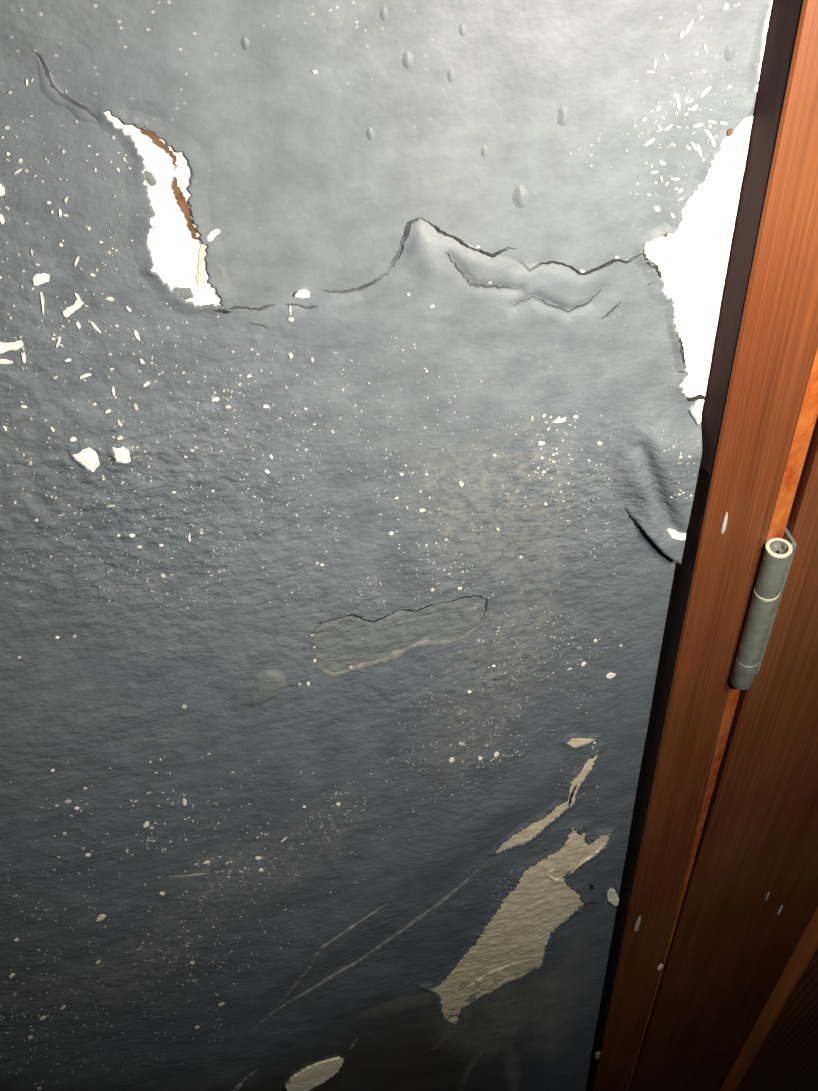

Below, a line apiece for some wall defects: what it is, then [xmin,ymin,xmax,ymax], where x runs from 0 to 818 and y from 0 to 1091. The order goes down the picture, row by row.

peeling [0,115,68,224]
crack [34,51,102,124]
peeling [74,91,238,327]
crack [229,217,646,328]
peeling [633,0,773,428]
peeling [0,242,349,611]
peeling [494,414,619,557]
peeling [311,448,622,813]
peeling [38,833,109,930]
peeling [120,781,364,1013]
peeling [415,723,620,1024]
peeling [282,1053,345,1091]